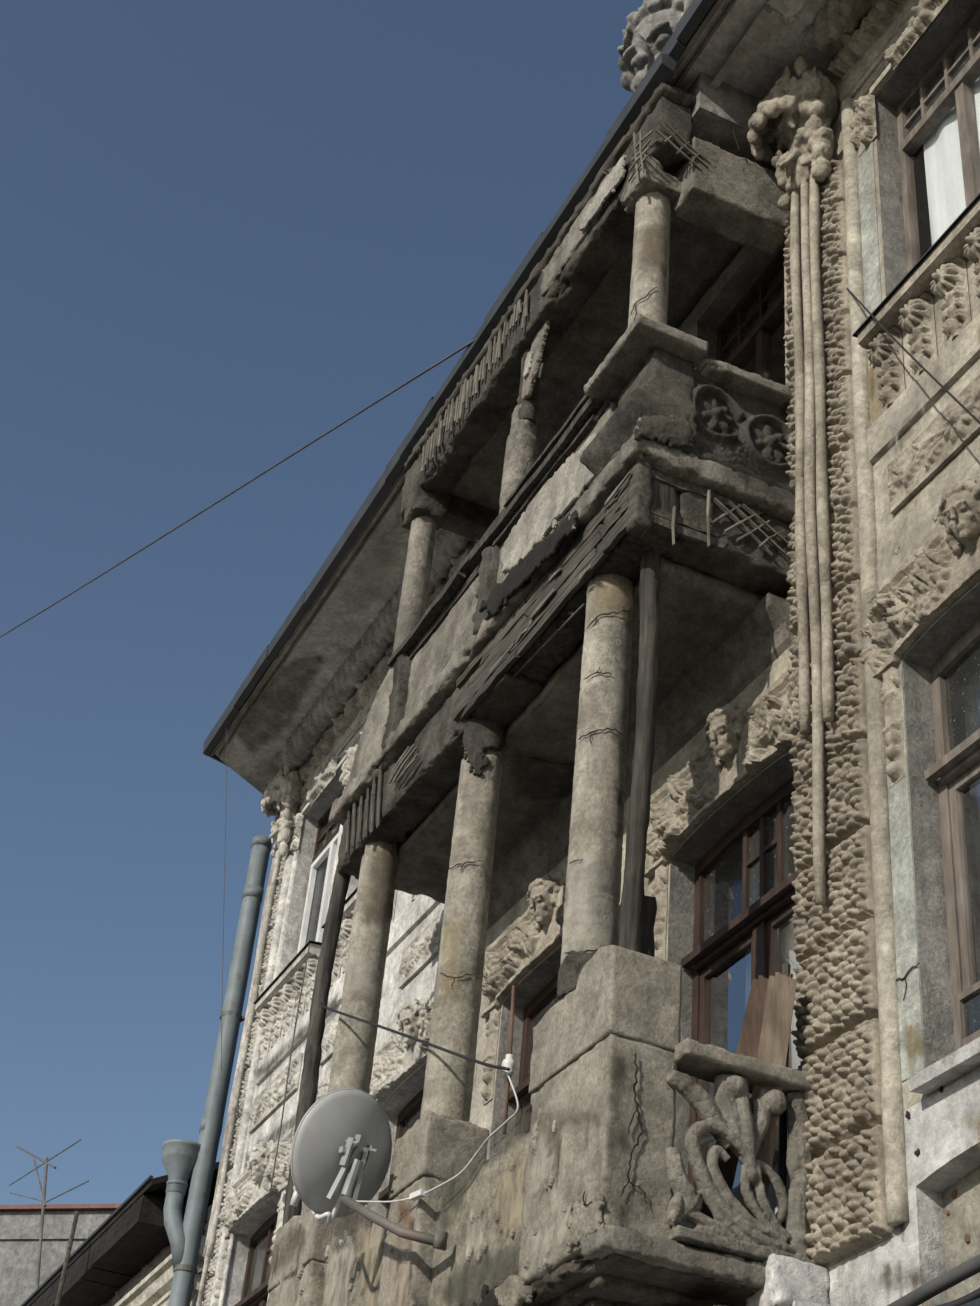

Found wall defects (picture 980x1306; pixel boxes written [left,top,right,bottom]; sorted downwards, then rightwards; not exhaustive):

flaking render [479,432,597,617]
crack [587,610,628,629]
flaking render [324,1224,415,1306]
flaking render [465,1107,604,1306]
crack [571,1053,647,1211]